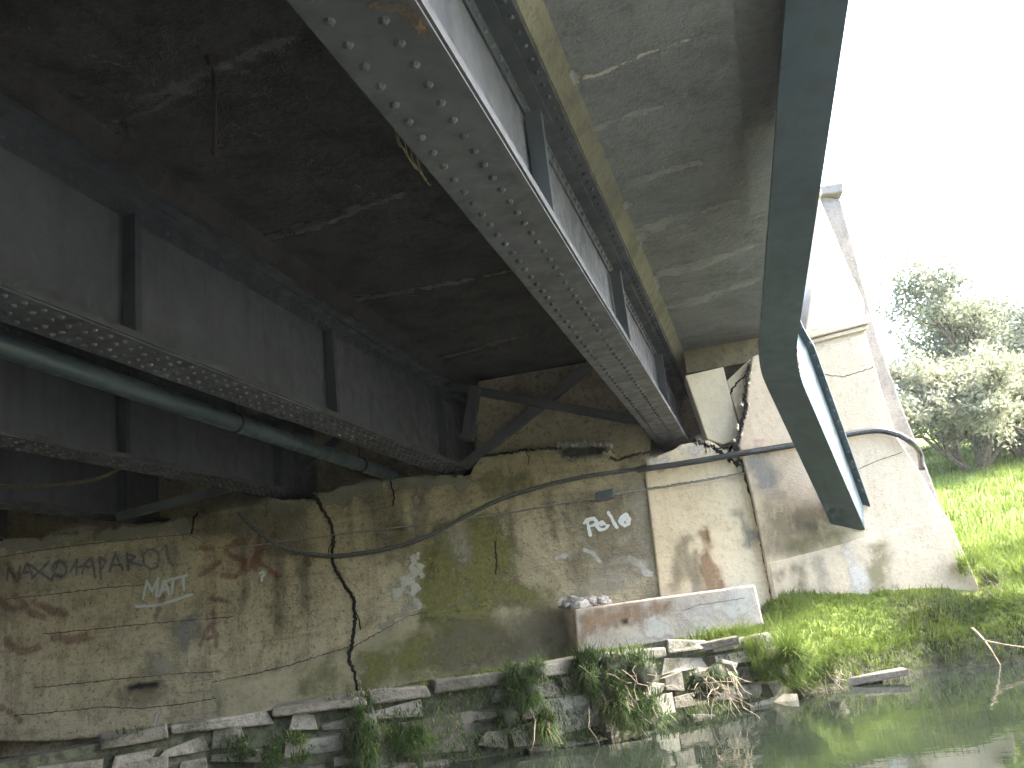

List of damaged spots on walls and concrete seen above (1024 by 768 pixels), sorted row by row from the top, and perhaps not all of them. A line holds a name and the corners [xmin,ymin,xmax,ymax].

crack [475,447,561,464]
crack [607,451,650,461]
crack [646,363,772,600]
crack [0,497,432,716]
leakage [379,552,425,629]
rust [694,529,724,591]